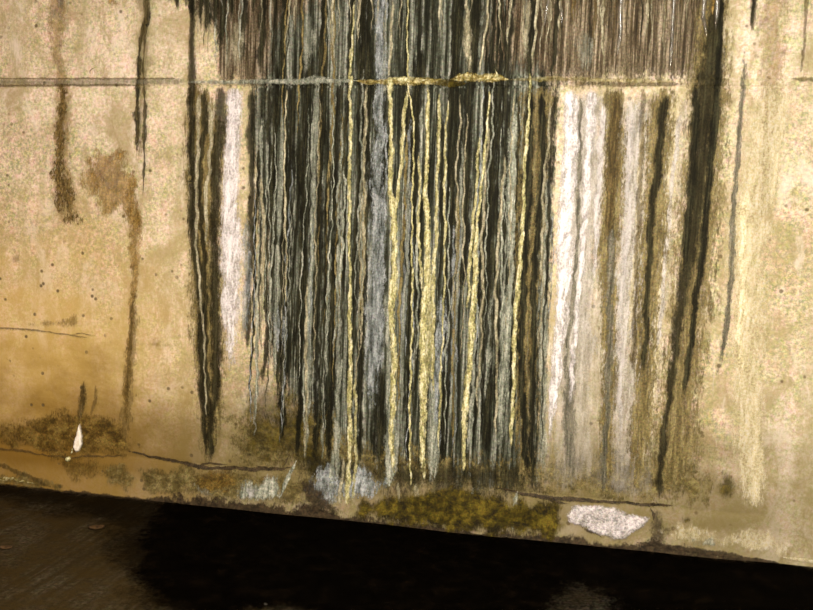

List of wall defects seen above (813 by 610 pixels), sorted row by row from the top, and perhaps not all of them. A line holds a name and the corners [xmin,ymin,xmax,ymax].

leakage [0,0,175,225]
leakage [175,0,792,511]
leakage [65,382,86,461]
leakage [0,483,813,610]
spalling [568,505,649,540]